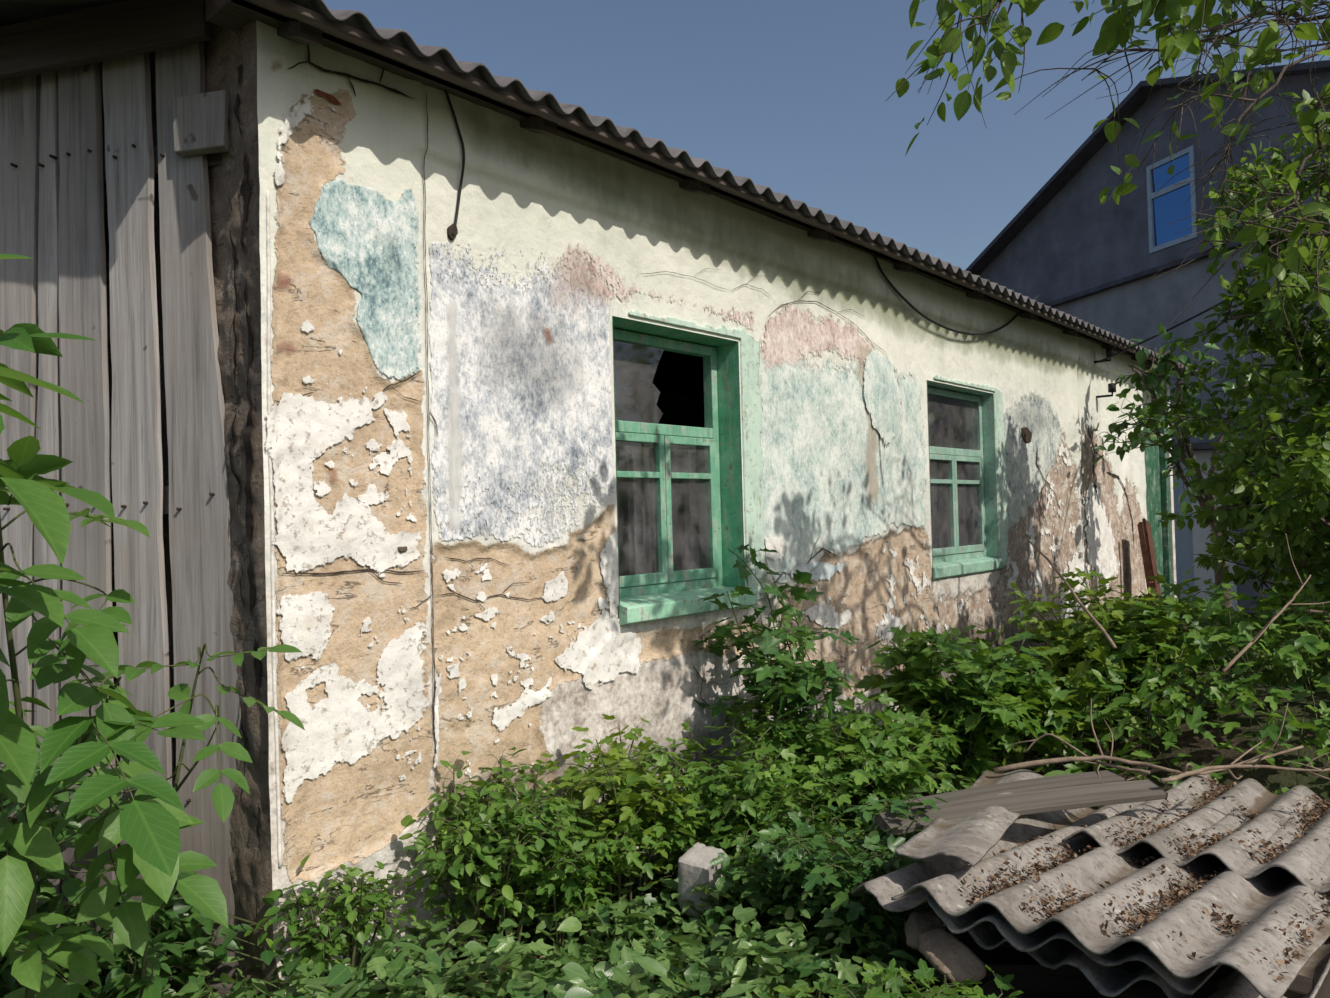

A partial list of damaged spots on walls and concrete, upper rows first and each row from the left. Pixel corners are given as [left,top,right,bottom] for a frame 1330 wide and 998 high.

spalling [271,88,1147,883]
crack [1036,450,1060,528]